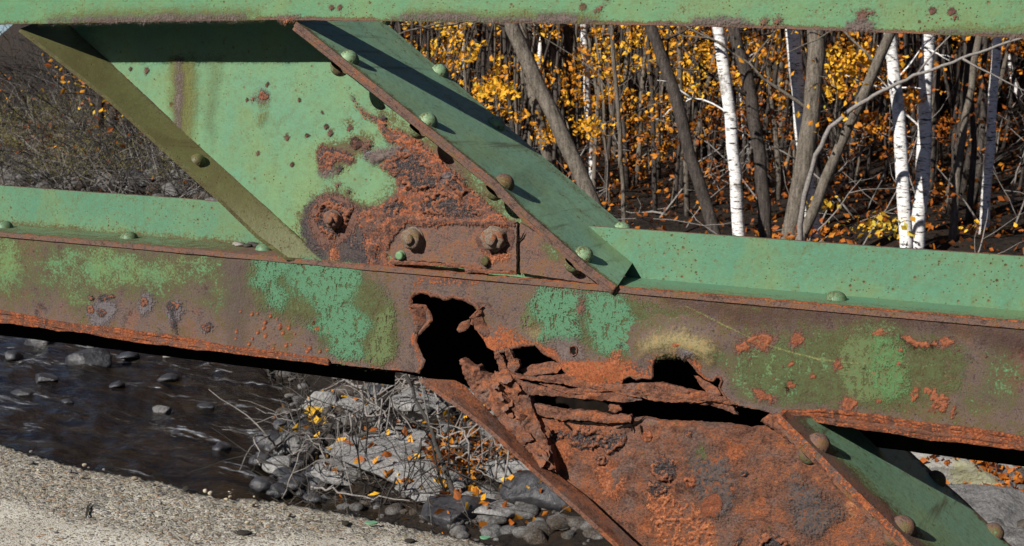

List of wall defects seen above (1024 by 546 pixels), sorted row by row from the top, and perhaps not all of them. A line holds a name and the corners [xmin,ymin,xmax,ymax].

rust [844,7,878,34]
rust [300,95,516,269]
rust [85,294,119,326]
peeling [457,319,471,332]
peeling [520,360,561,376]
rust [459,327,740,504]
peeling [519,286,697,365]
rust [731,329,806,450]
rust [867,328,959,368]
rust [897,374,956,419]
rust [646,431,748,546]
rust [756,468,850,546]